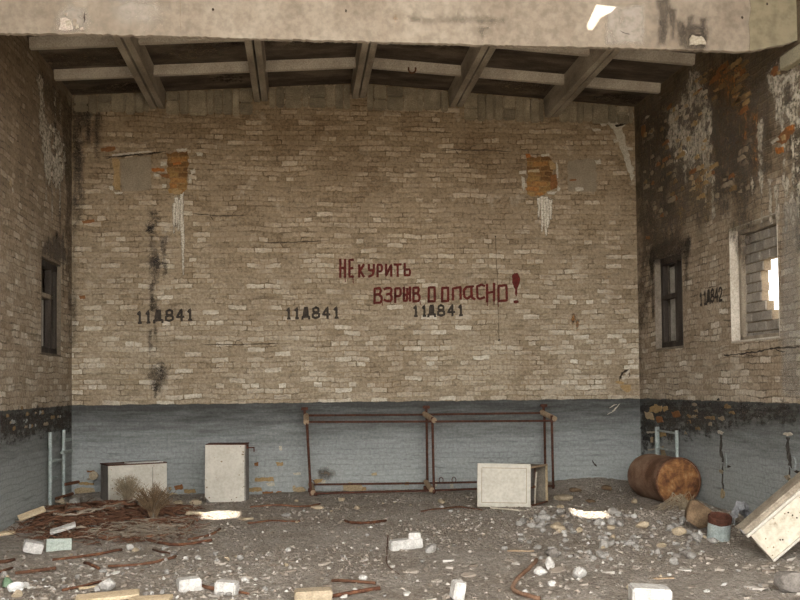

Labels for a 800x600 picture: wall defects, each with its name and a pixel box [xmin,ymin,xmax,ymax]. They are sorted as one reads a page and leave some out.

water stain [657,0,706,49]
water stain [36,74,66,237]
spalling [151,148,203,195]
spalling [519,154,560,197]
spalling [771,124,795,154]
water stain [160,192,185,275]
water stain [537,196,553,236]
crack [724,346,799,356]
peeling [1,404,71,443]
peeling [640,398,800,499]